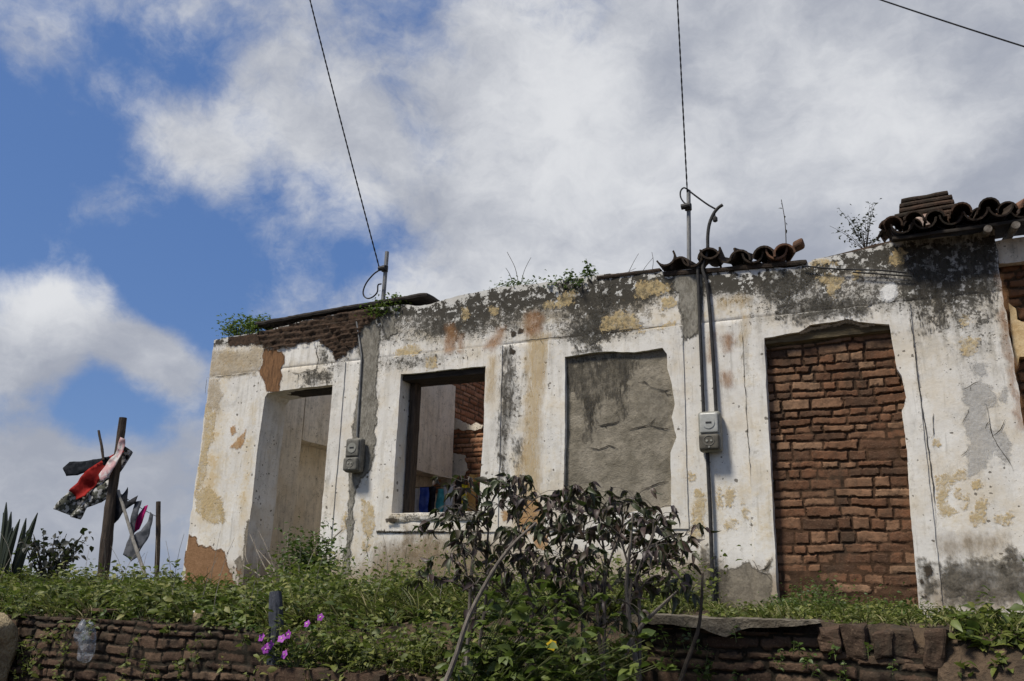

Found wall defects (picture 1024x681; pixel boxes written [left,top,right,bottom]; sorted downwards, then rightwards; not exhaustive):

spalling [599,279,677,334]
water stain [758,267,873,327]
mould [883,231,999,336]
spalling [194,307,438,524]
water stain [491,339,545,498]
crack [909,313,936,520]
peeling [935,314,1014,527]
spalling [184,520,249,588]
water stain [916,538,1024,607]